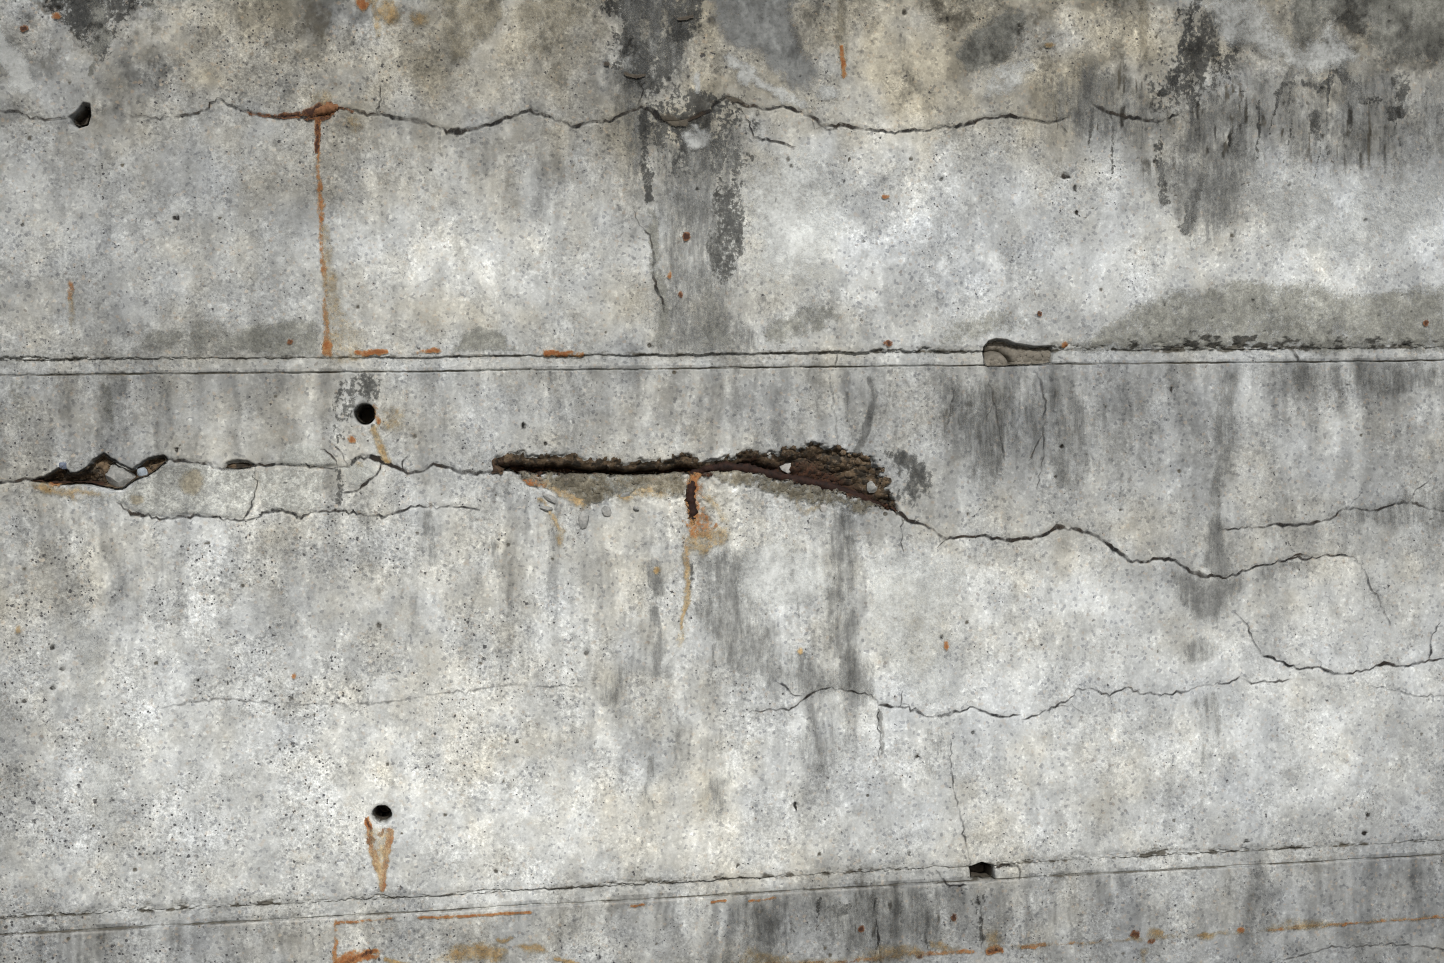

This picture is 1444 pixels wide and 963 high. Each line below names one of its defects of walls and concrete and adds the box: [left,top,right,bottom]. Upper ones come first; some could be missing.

crack [140,82,1179,147]
water stain [1059,0,1444,249]
corrosion [247,92,388,357]
water stain [443,0,847,353]
water stain [1081,280,1444,393]
peeling [31,444,372,515]
crack [119,446,494,521]
spalling [491,441,933,538]
crack [892,483,1426,622]
crack [1217,620,1443,697]
corrosion [364,816,394,892]
corrosion [332,917,405,963]